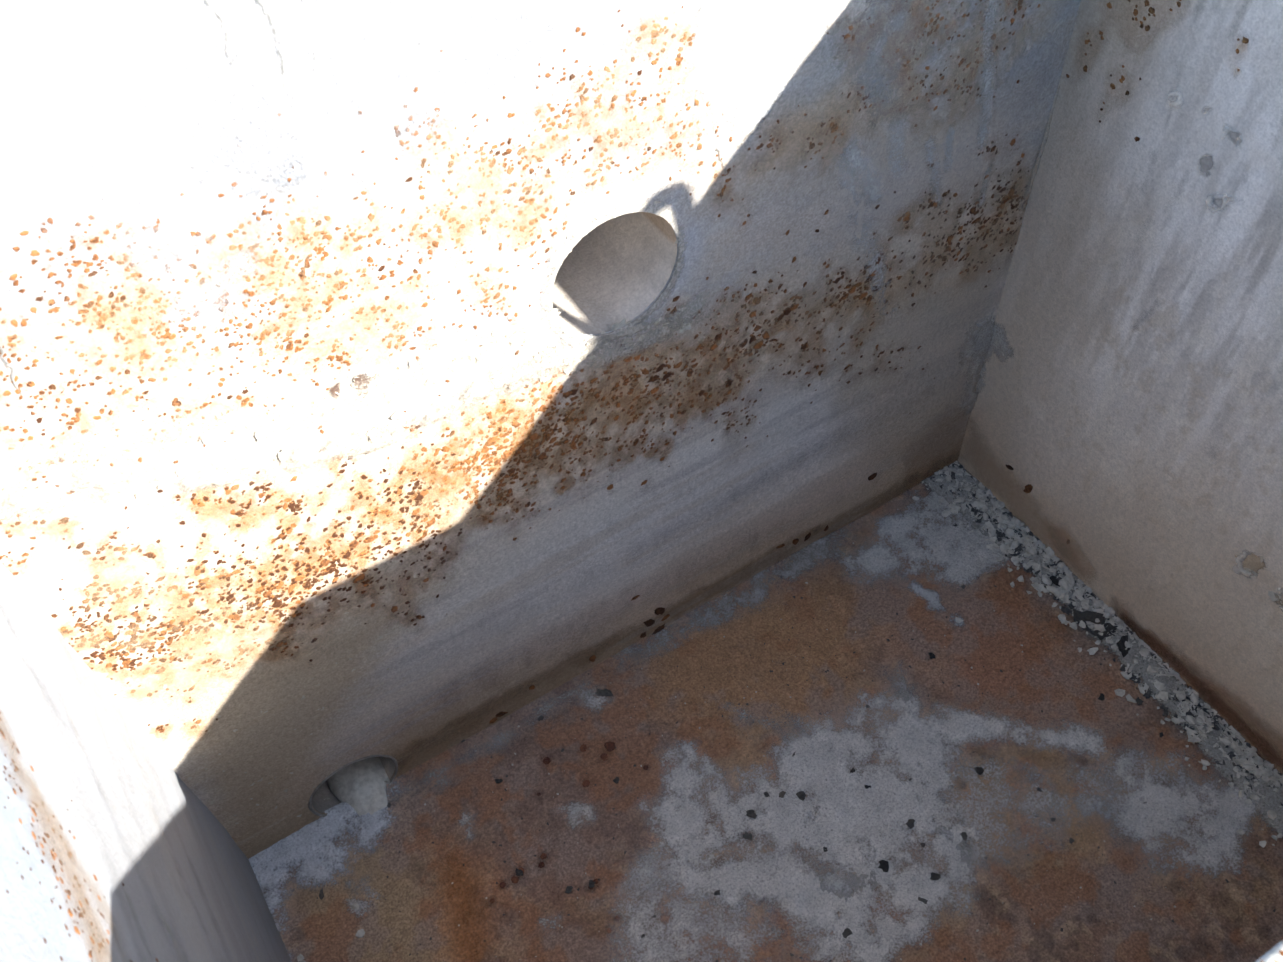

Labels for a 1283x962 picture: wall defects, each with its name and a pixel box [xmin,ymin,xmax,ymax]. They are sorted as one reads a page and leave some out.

rust [0,0,1040,703]
rust [0,711,110,962]
rust [148,718,218,733]
water stain [612,665,1258,962]
rust [1120,614,1283,774]